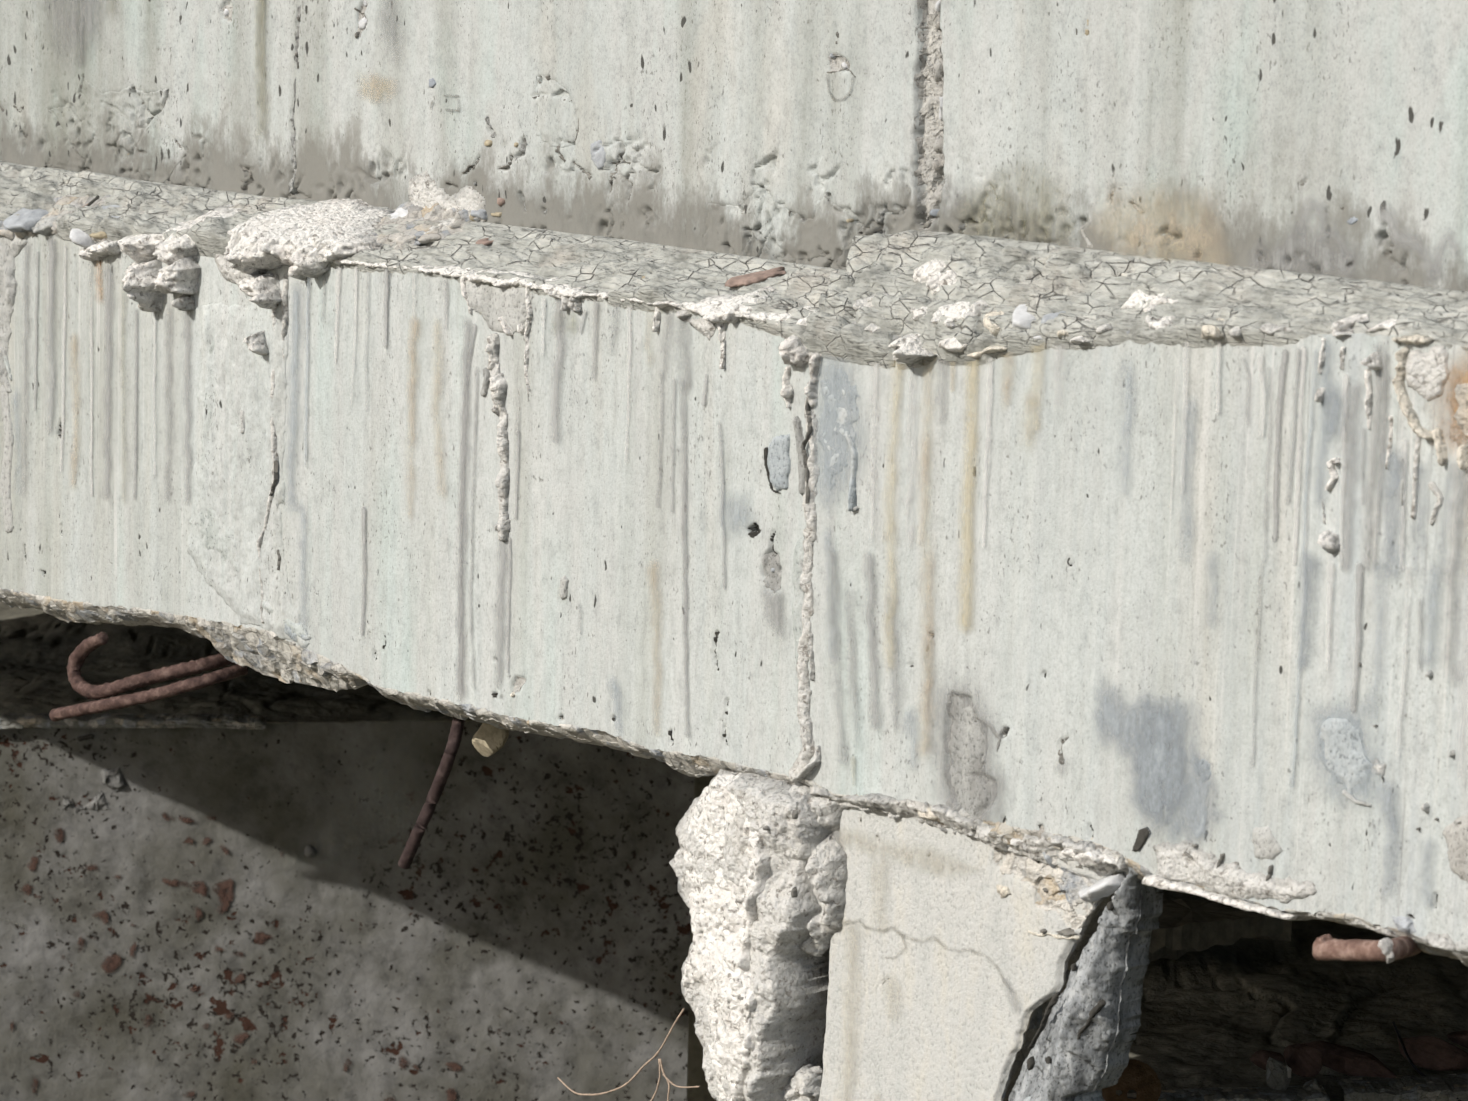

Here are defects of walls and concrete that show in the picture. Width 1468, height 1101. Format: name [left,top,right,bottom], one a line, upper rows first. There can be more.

spalling [0,194,120,248]
spalling [371,202,494,250]
leakage [1129,214,1214,257]
leakage [1255,203,1352,273]
spalling [725,267,786,288]
spalling [852,259,1069,364]
leakage [1060,289,1179,351]
leakage [1201,318,1293,371]
rust [1449,369,1468,446]
leakage [1258,314,1468,611]
leakage [1098,694,1211,838]
spalling [992,847,1125,940]